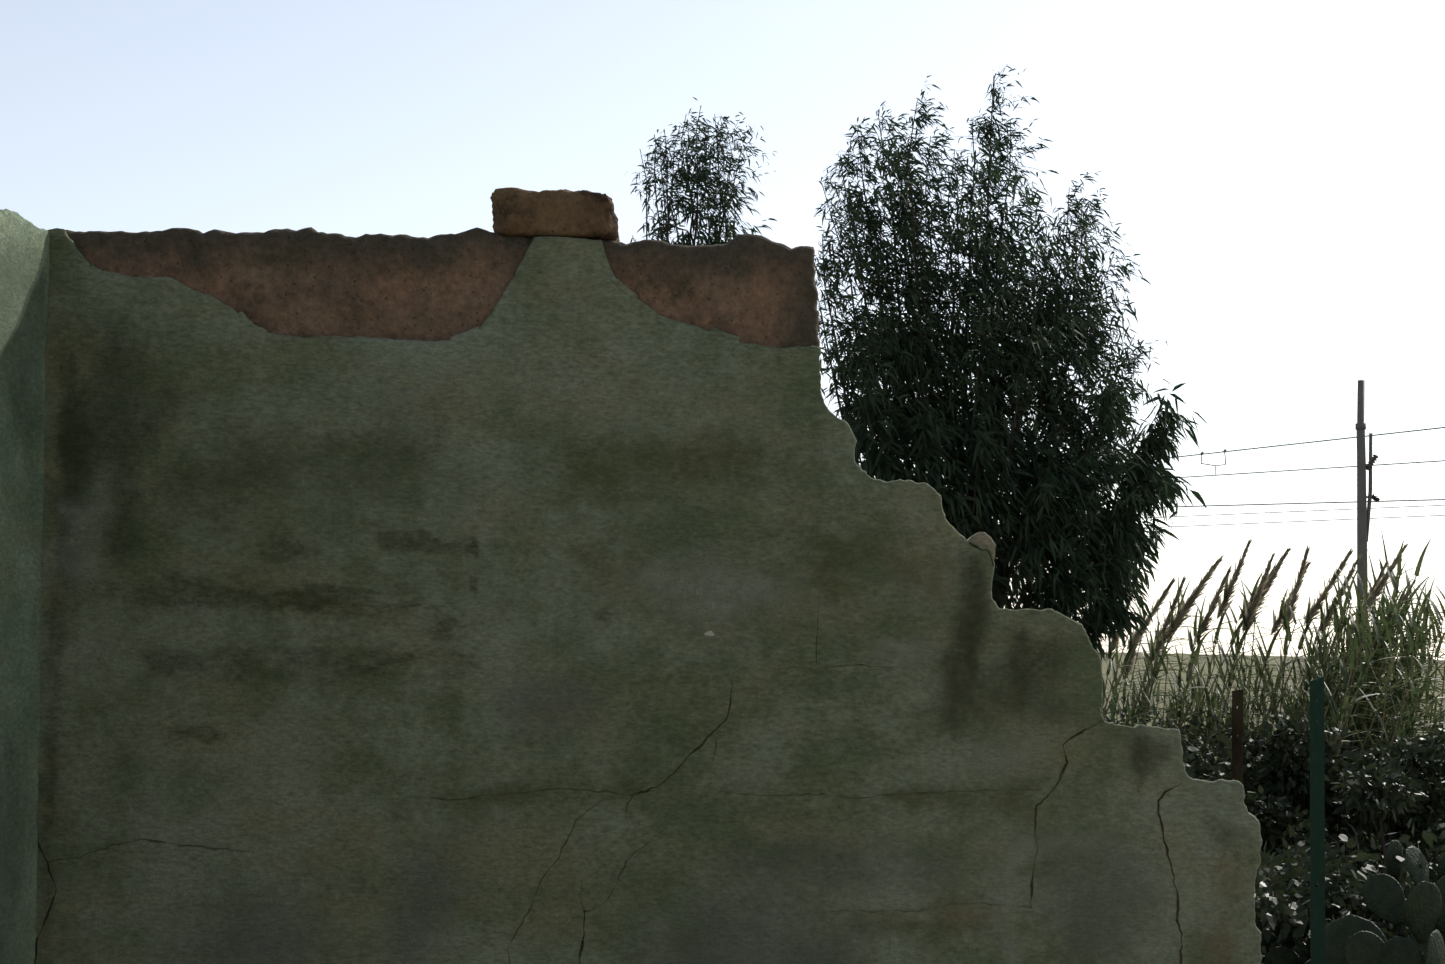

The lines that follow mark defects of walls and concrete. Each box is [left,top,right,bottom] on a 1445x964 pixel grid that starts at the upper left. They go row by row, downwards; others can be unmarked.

spalling [66,227,534,342]
spalling [602,234,820,349]
crack [34,838,221,964]
crack [508,682,732,964]
crack [1030,729,1087,908]
crack [1157,783,1183,964]